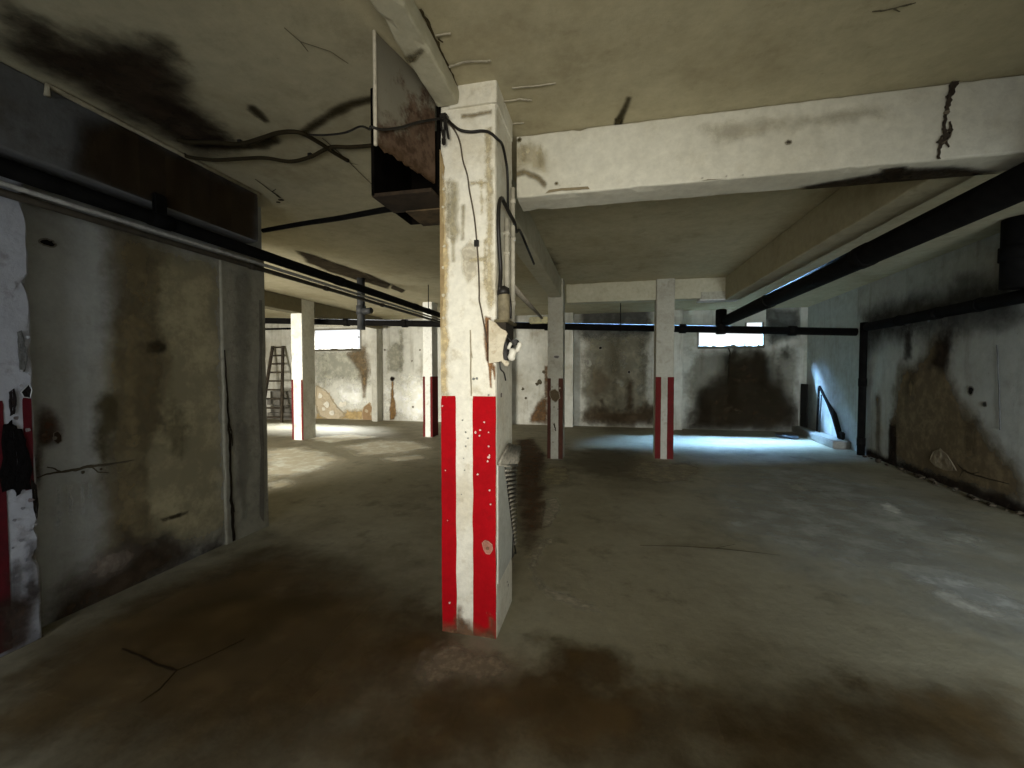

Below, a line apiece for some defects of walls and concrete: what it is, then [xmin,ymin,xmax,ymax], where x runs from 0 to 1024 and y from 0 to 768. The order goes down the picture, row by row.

leakage [3,15,226,153]
crack [936,80,962,159]
crack [37,460,134,478]
leakage [49,222,225,624]
crack [224,350,236,541]
spalling [315,386,347,419]
spalling [362,402,372,420]
leakage [584,344,653,427]
leakage [689,352,798,431]
leakage [866,332,1024,513]
crack [121,639,244,703]
leakage [390,618,1024,768]